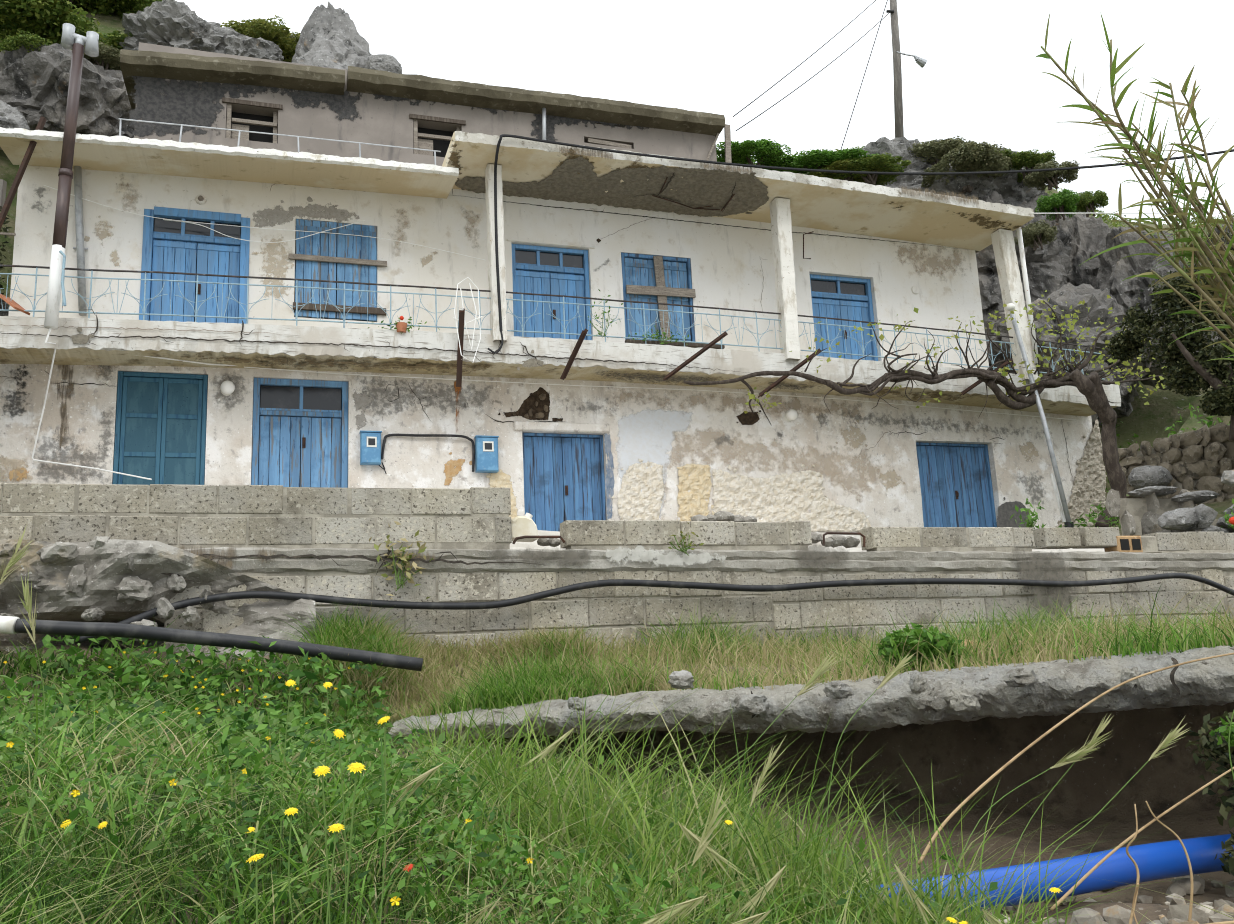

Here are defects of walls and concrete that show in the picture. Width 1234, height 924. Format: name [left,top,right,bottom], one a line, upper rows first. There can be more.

spalling [455,177,486,193]
spalling [502,157,769,217]
peeling [252,197,359,297]
leakage [3,365,27,416]
leakage [57,365,74,448]
spalling [737,410,761,425]
flaking render [612,459,872,532]
peeling [879,471,905,490]